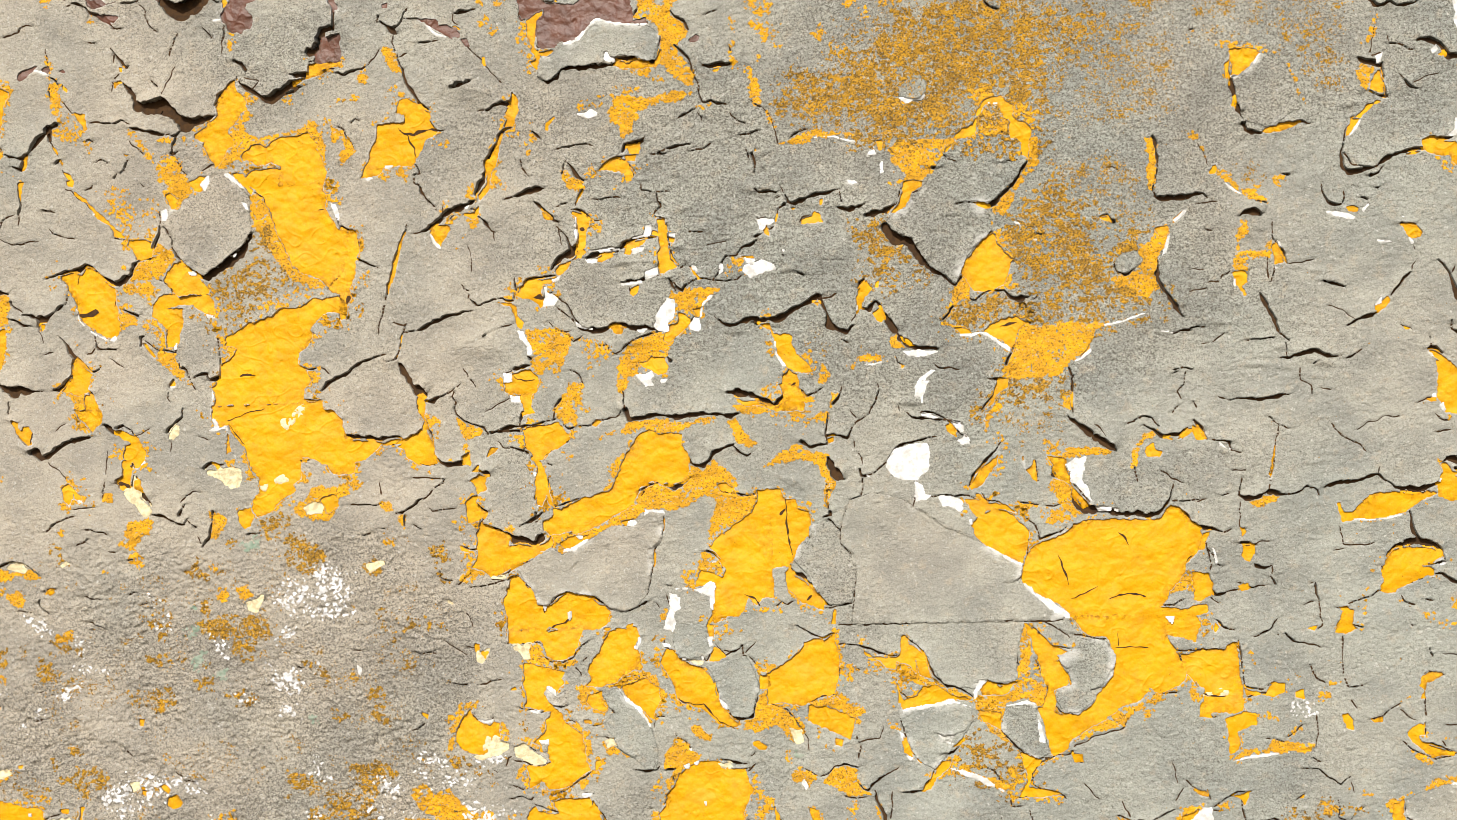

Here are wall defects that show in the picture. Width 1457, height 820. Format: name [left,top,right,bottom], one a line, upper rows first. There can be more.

peeling [292,34,345,95]
peeling [1215,40,1301,133]
peeling [1406,117,1457,173]
crack [0,192,298,561]
crack [308,0,1457,820]
peeling [1426,348,1457,420]
peeling [45,75,1305,820]
peeling [1308,458,1457,634]
crack [0,561,148,628]
peeling [1407,723,1456,758]
peeling [0,792,85,820]
peeling [1390,782,1457,820]